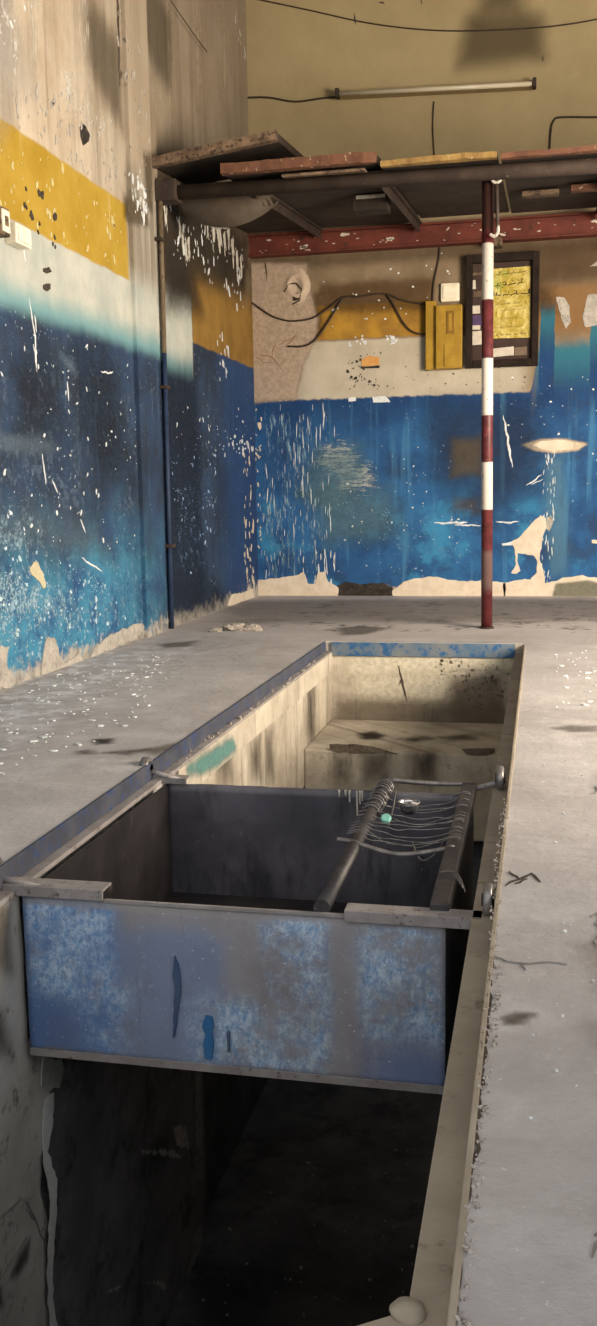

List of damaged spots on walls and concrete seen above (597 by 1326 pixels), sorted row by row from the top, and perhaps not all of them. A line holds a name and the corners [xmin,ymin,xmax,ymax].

spalling [0,324,144,689]
peeling [0,0,597,606]
crack [468,793,567,1202]